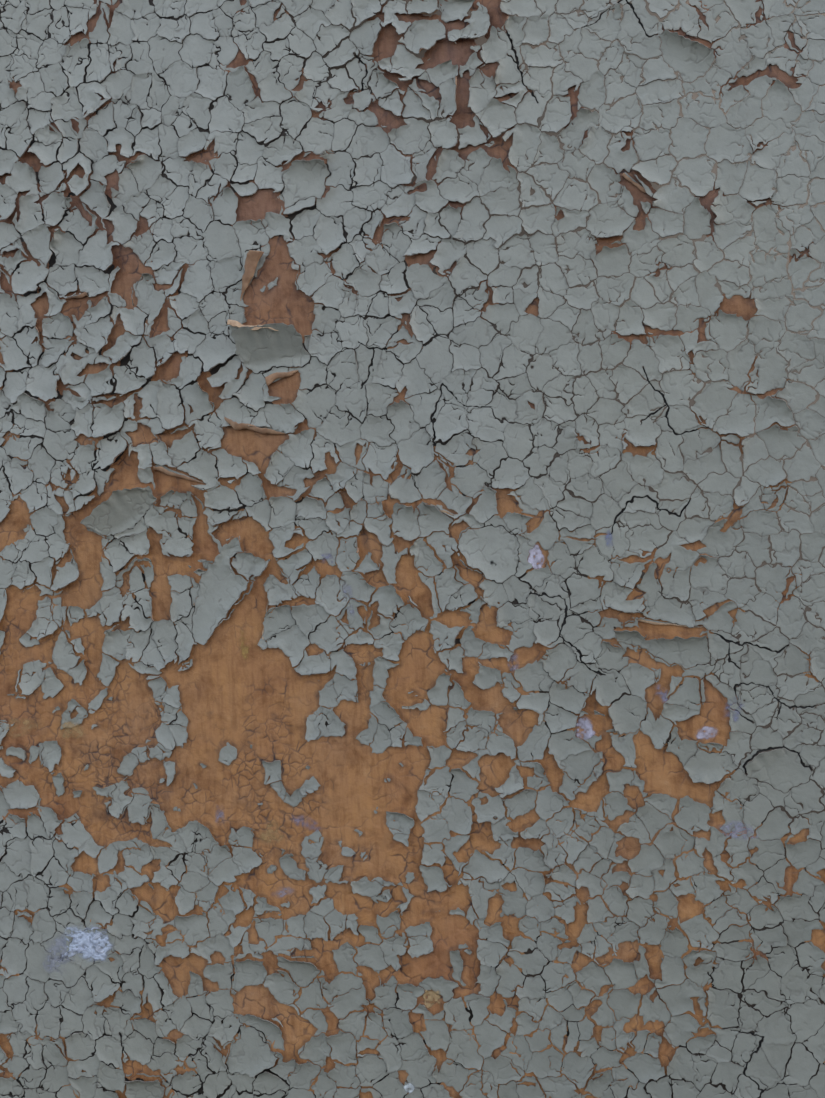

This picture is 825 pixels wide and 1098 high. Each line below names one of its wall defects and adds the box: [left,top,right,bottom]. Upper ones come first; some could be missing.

peeling [311,0,598,128]
peeling [0,69,382,536]
crack [0,0,825,841]
peeling [0,260,738,1098]
peeling [269,454,825,956]
crack [0,907,203,1098]
crack [356,997,582,1098]
crack [701,940,825,1098]